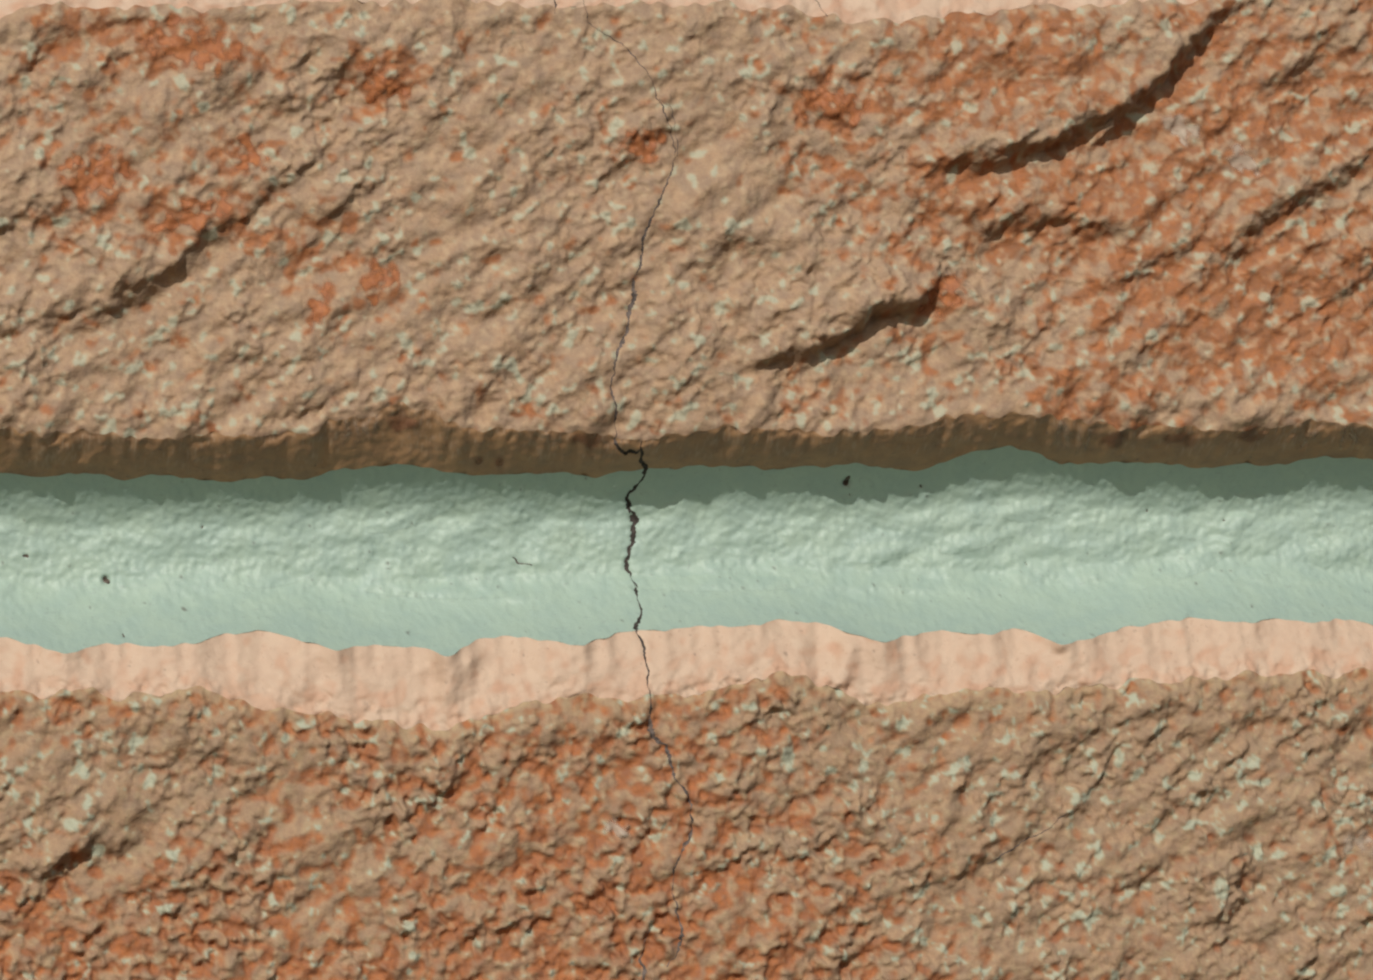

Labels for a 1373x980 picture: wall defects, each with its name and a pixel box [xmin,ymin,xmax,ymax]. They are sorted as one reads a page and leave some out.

crack [554,0,694,980]